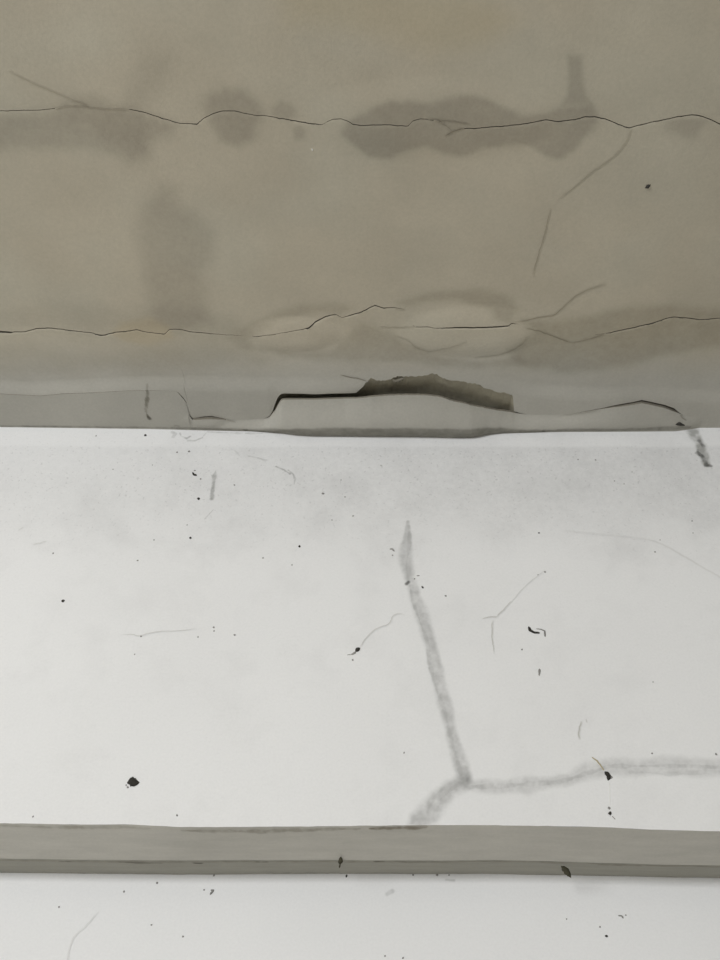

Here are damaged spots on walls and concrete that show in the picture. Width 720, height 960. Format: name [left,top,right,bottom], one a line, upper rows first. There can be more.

crack [0,284,719,359]
crack [0,72,720,276]
leakage [0,46,720,442]
peeling [267,373,520,428]
crack [359,520,720,825]